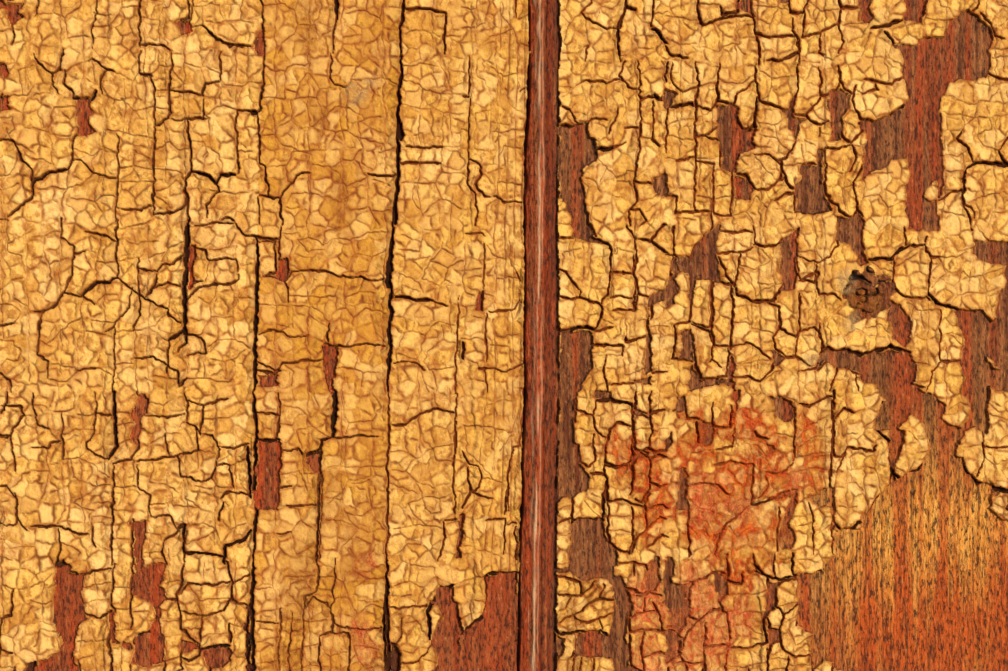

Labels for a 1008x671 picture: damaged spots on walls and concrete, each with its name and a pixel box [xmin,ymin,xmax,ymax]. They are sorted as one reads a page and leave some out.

peeling [10,503,270,671]
crack [0,0,529,671]
peeling [233,421,340,526]
peeling [370,495,520,671]
crack [555,0,1008,671]
peeling [555,0,1008,671]